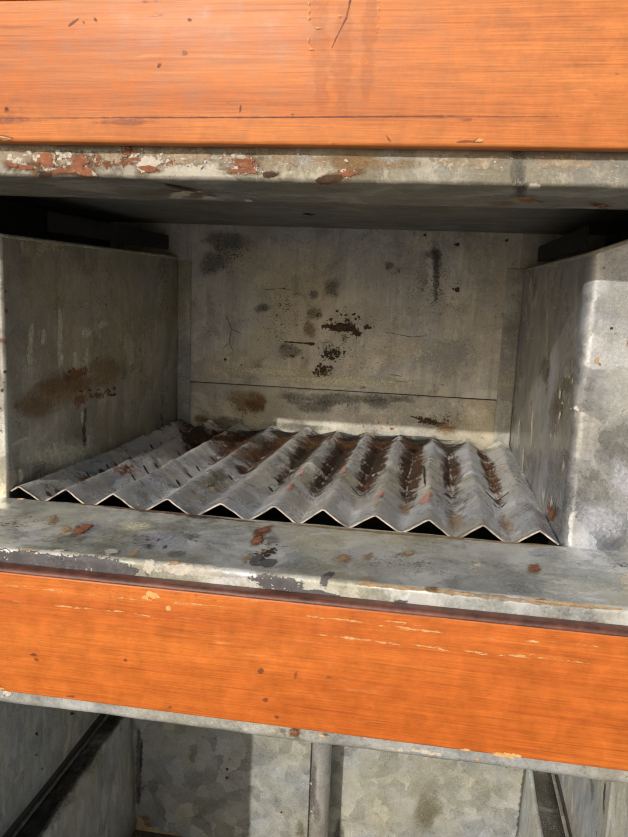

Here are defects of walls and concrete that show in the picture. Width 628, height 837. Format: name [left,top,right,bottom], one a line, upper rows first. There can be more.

crack [332,0,351,47]
peeling [0,136,406,172]
corrosion [246,285,386,389]
corrosion [98,461,135,477]
corrosion [173,392,285,491]
corrosion [273,440,359,498]
corrosion [356,401,424,514]
corrosion [411,409,469,433]
corrosion [441,454,464,502]
corrosion [476,451,501,504]
corrosion [251,526,271,545]
peeling [0,548,142,575]